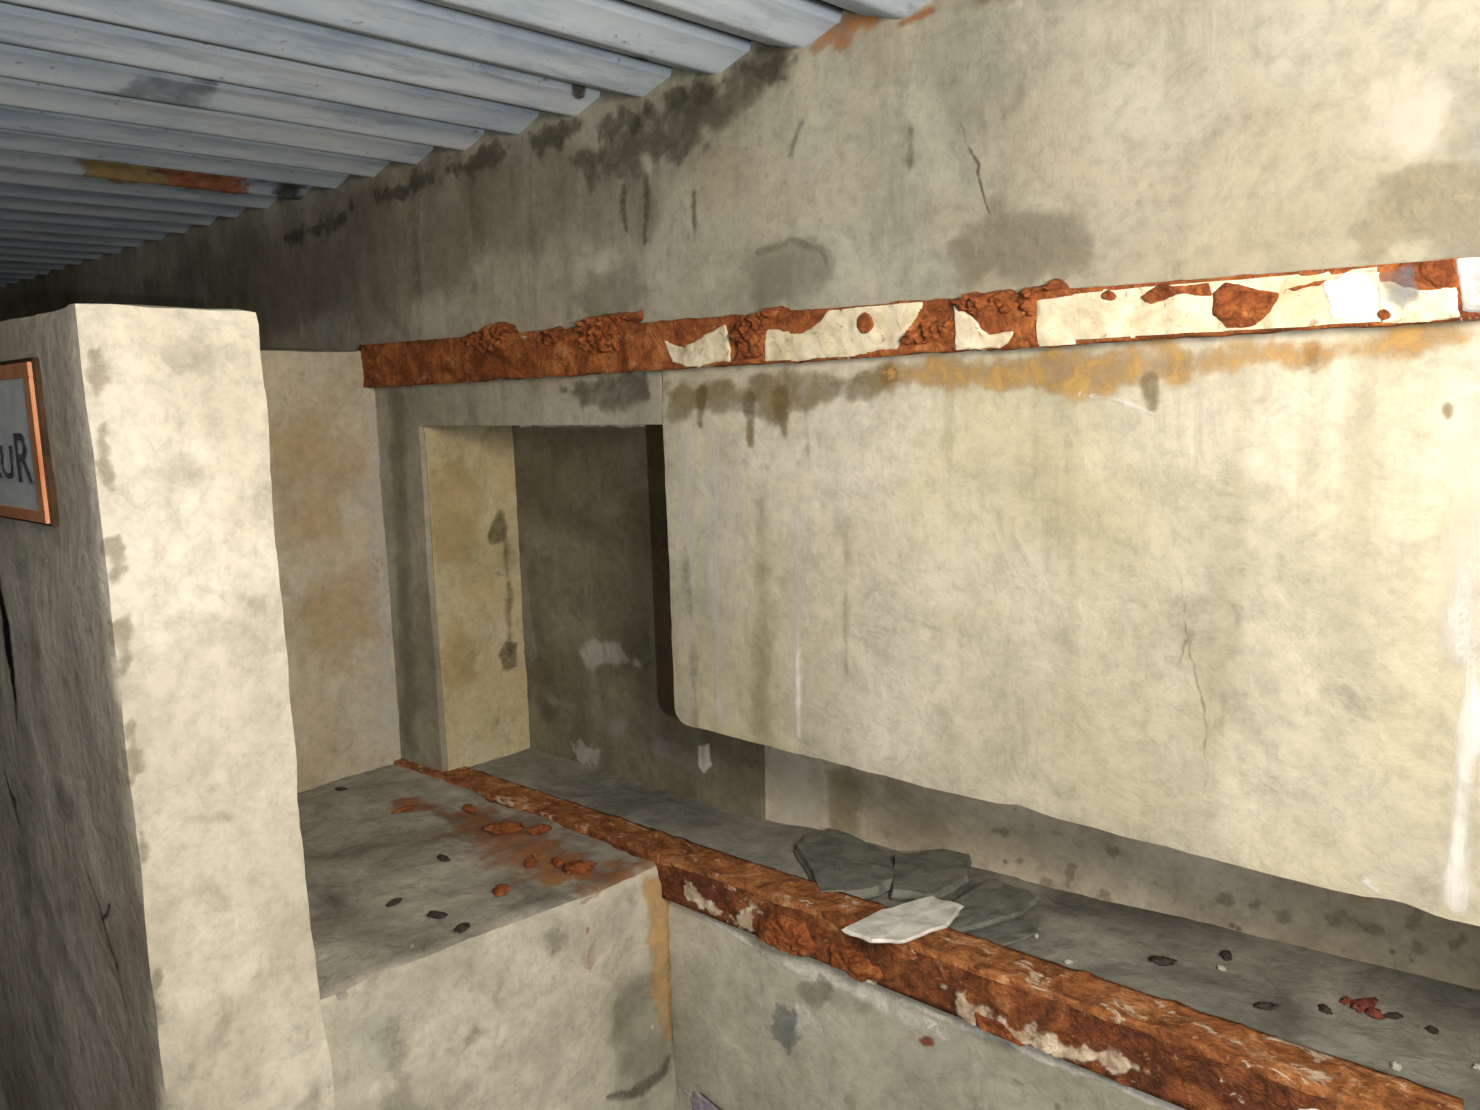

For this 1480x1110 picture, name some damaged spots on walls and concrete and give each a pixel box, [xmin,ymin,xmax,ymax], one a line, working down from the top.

rust [82,159,250,195]
peeling [664,325,731,368]
peeling [765,302,923,362]
rust [857,312,874,334]
peeling [953,306,1013,351]
rust [1101,290,1117,301]
rust [1141,280,1327,328]
peeling [1036,257,1480,346]
rust [1376,309,1464,353]
rust [1398,260,1458,299]
crack [0,581,18,732]
leakage [1444,565,1480,912]